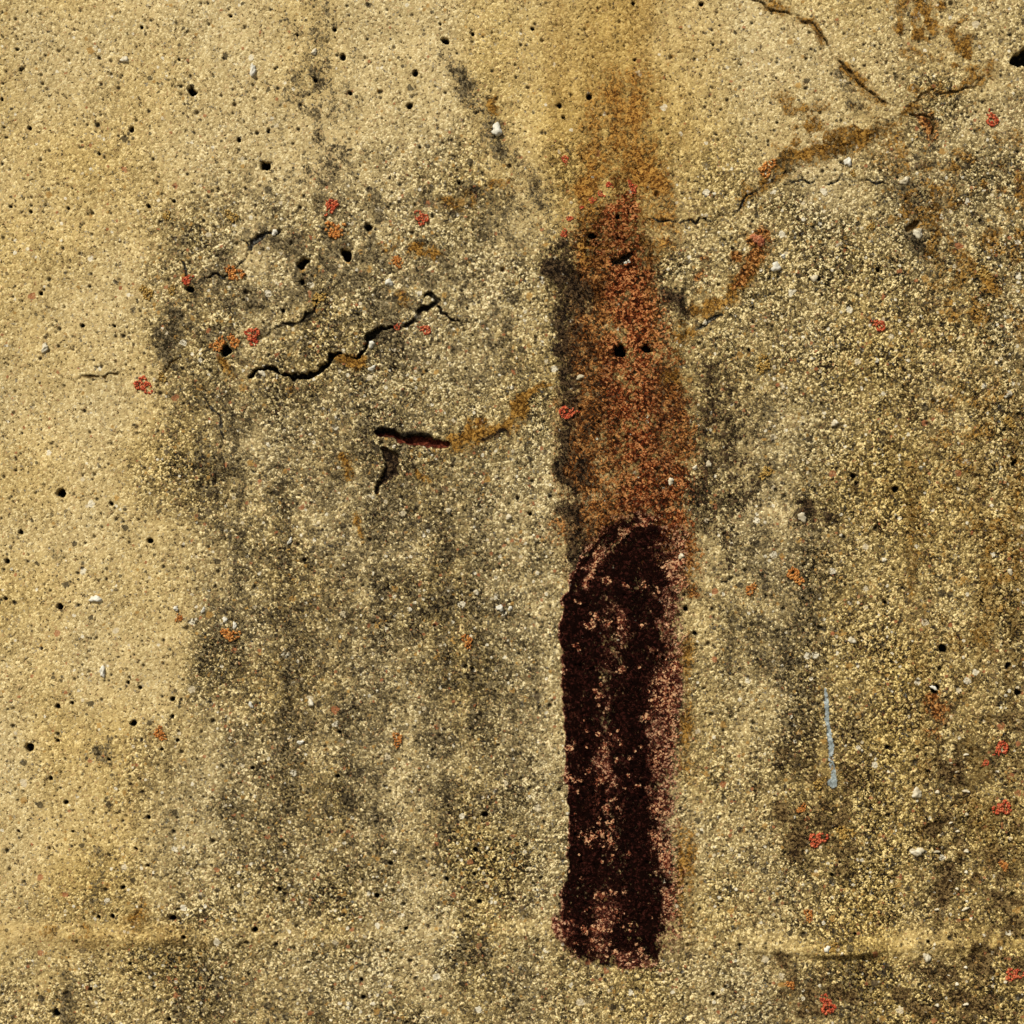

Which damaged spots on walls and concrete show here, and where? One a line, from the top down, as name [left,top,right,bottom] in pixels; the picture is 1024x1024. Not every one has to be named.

crack [752,0,971,134]
crack [173,231,279,287]
crack [649,217,710,225]
crack [737,171,885,212]
crack [249,292,460,382]
damp [146,0,557,908]
rust [433,0,775,970]
damp [91,737,115,780]
damp [85,846,105,906]
damp [54,970,80,1024]
damp [163,942,330,1024]
damp [436,930,550,1024]